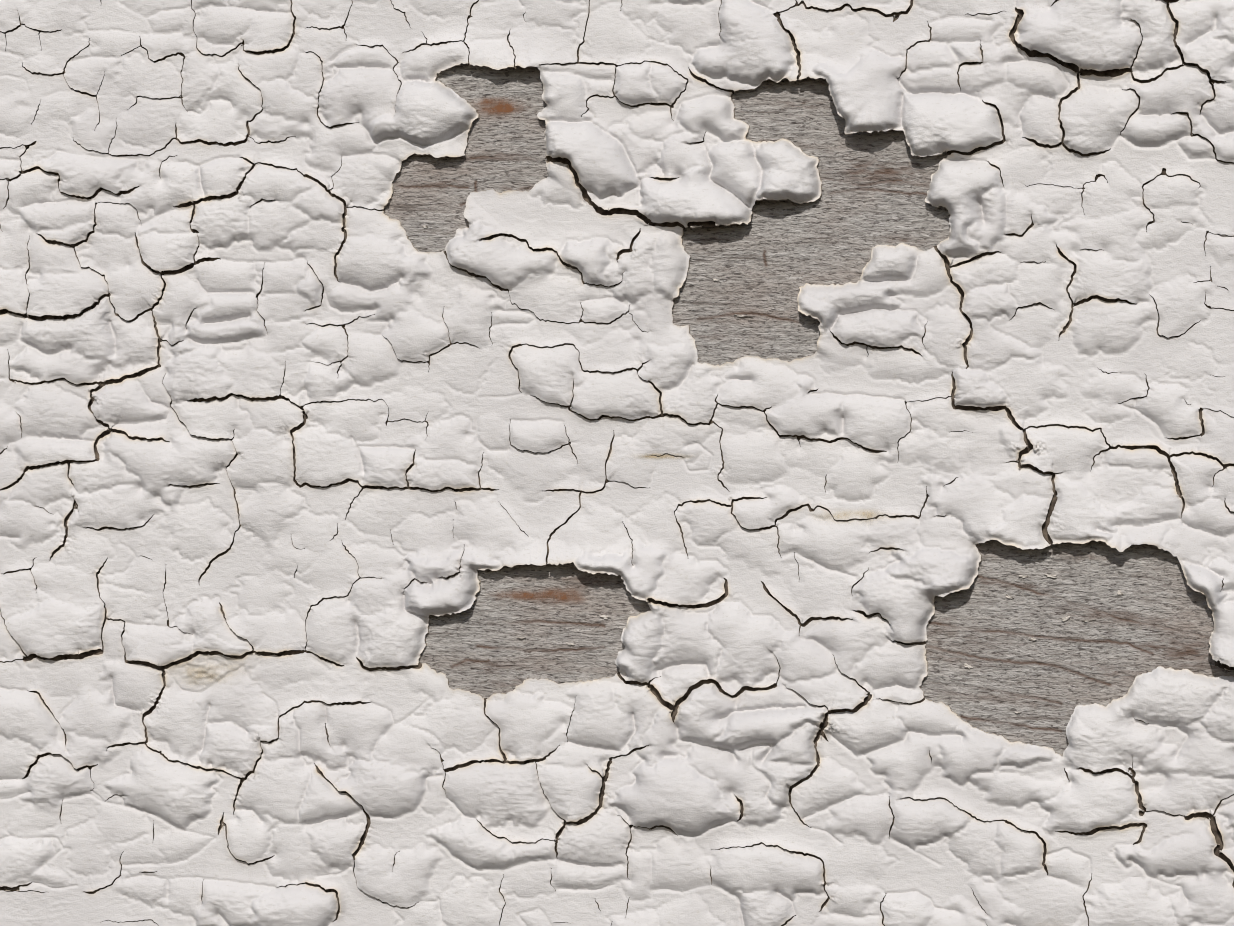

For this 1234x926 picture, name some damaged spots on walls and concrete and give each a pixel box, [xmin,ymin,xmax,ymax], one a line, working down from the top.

crack [481,156,715,288]
crack [507,0,734,144]
peeling [369,0,1003,366]
crack [773,0,932,80]
crack [947,0,1234,212]
crack [0,0,529,865]
peeling [403,548,665,698]
crack [648,578,728,608]
crack [761,547,926,645]
peeling [852,540,1234,755]
crack [432,695,677,925]
crack [616,655,925,926]